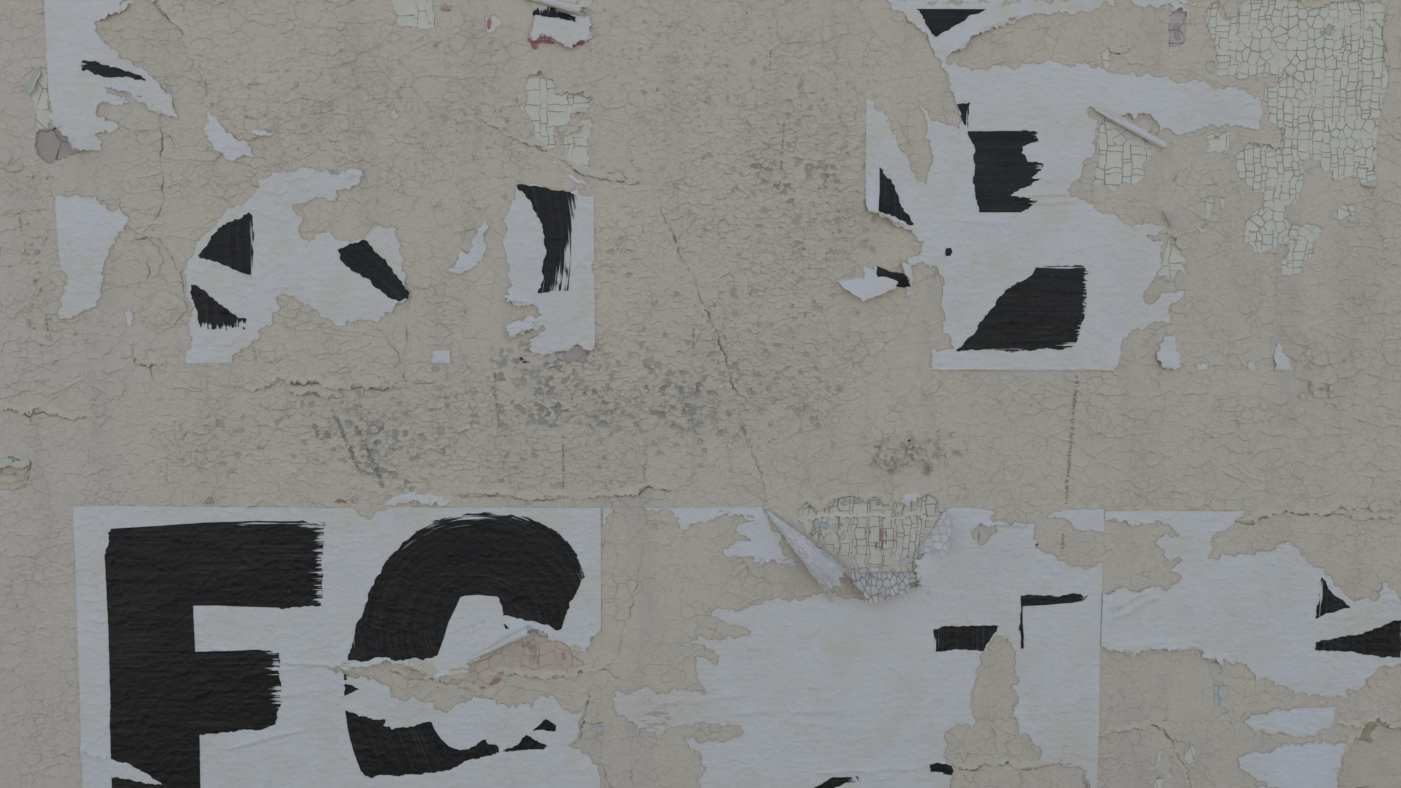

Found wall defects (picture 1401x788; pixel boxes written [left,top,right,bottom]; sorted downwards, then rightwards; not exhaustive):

peeling [390,0,434,30]
crack [157,127,176,217]
peeling [519,68,595,169]
peeling [1091,117,1162,192]
peeling [1169,0,1392,276]
crack [239,327,431,399]
spalling [555,344,590,363]
crack [661,212,770,491]
crack [385,465,683,507]
peeling [797,429,960,573]
crack [1237,499,1401,525]
crack [400,563,642,683]